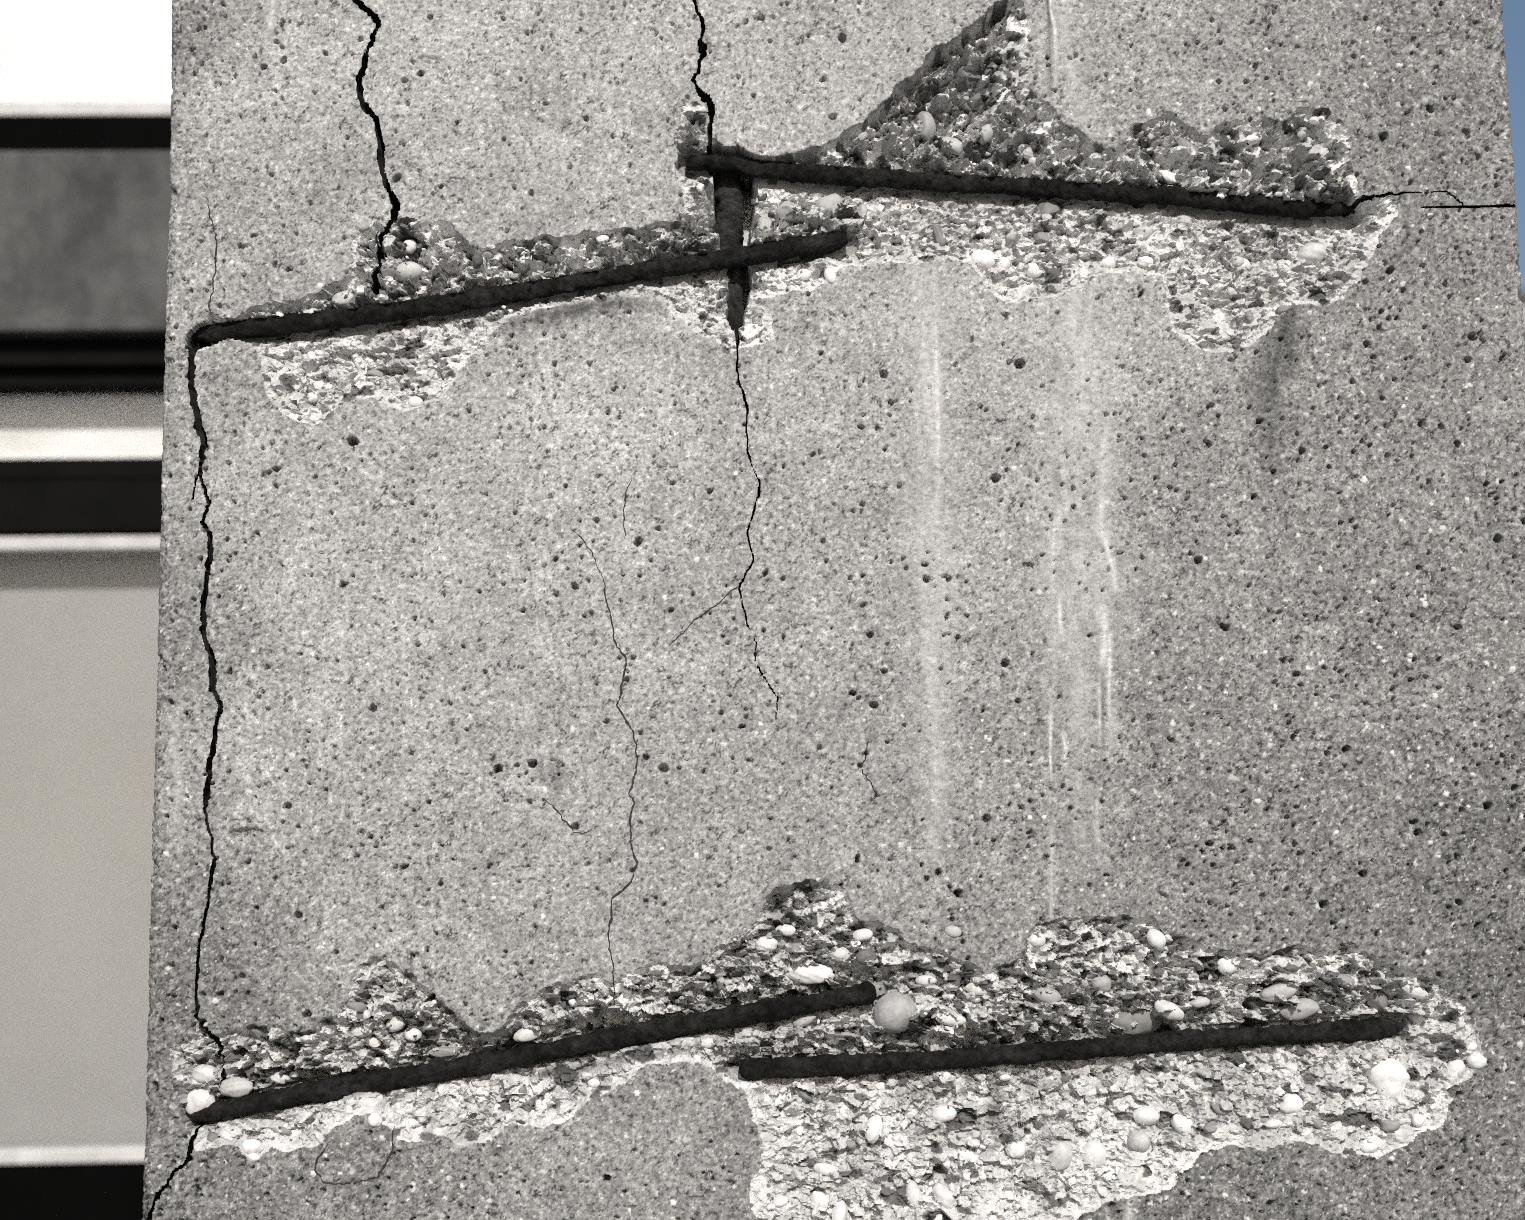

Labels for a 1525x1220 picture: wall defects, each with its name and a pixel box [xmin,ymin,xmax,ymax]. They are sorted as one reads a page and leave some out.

crack [352,0,401,295]
rust [534,300,630,321]
crack [691,0,715,185]
spalling [185,0,1399,426]
crack [1340,190,1468,217]
crack [185,198,227,1085]
crack [669,336,779,719]
crack [144,1122,206,1220]
spalling [170,879,1487,1220]